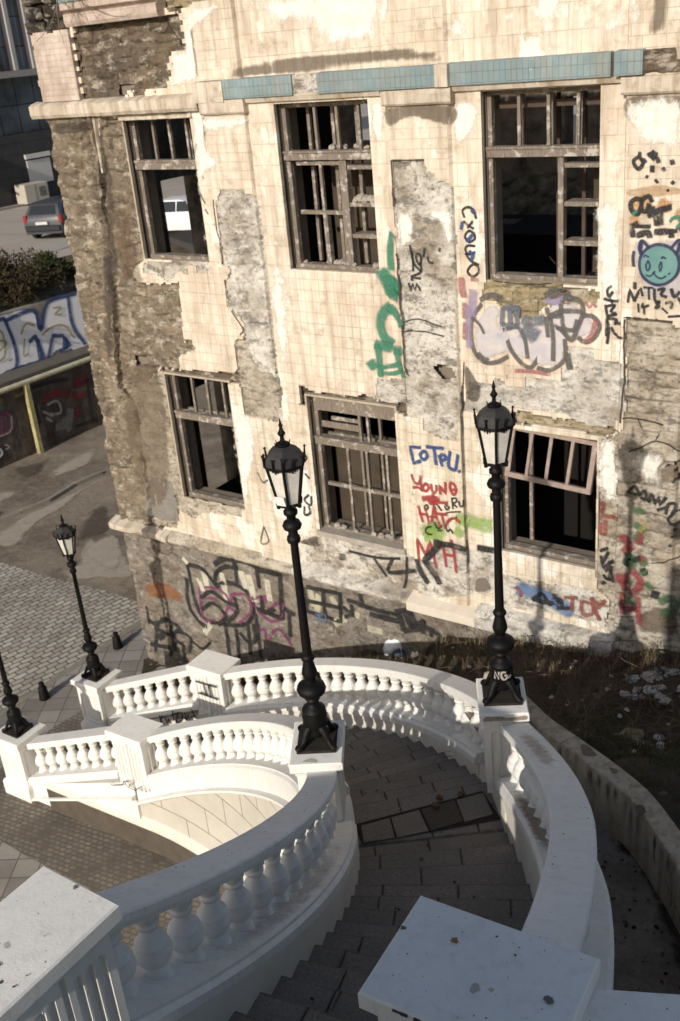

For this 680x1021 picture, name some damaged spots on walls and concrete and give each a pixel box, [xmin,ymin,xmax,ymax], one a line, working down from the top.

spalling [21,0,203,99]
leakage [235,49,434,76]
leakage [653,0,666,30]
spalling [99,116,283,528]
spalling [298,159,680,652]